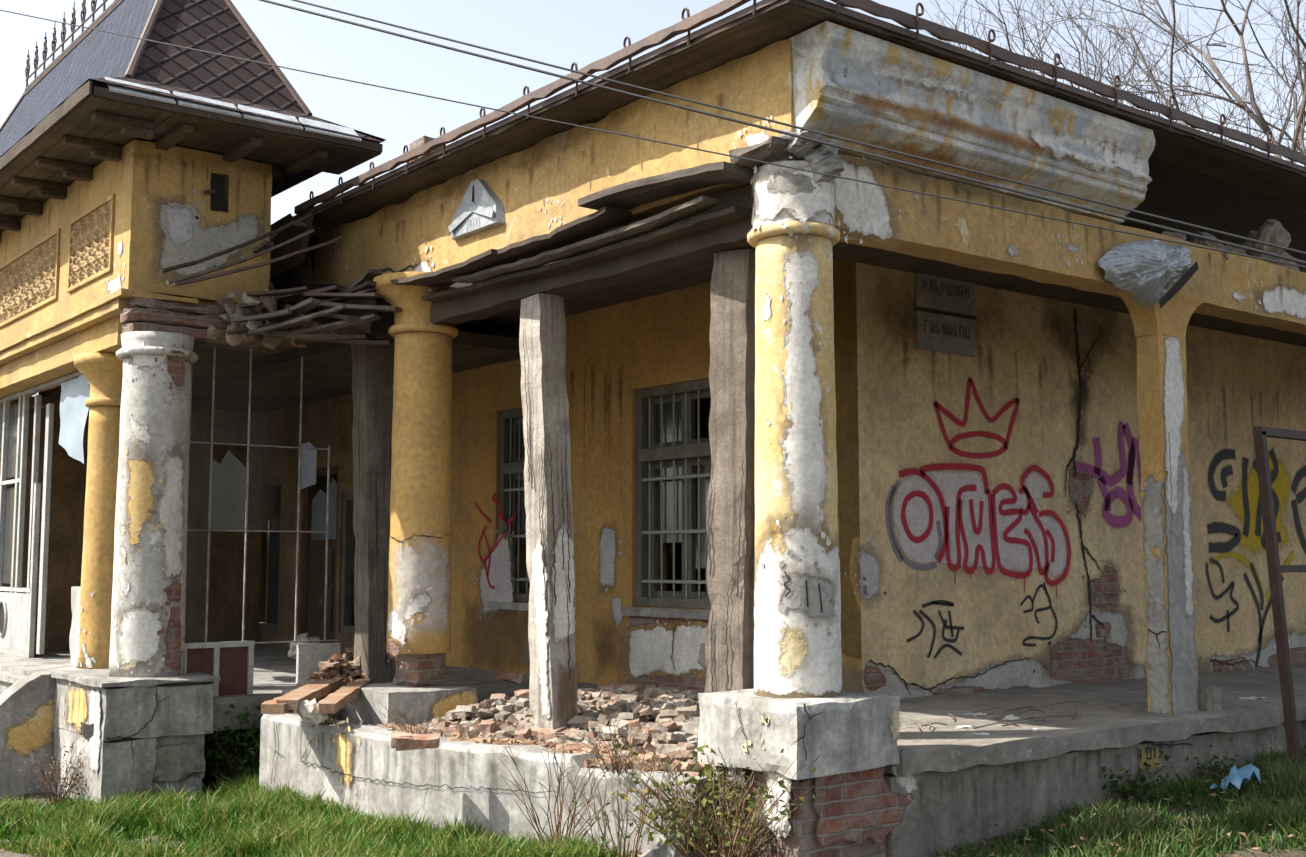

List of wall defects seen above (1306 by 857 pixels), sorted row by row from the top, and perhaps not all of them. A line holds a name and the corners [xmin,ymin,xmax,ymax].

rust [870,143,994,182]
rust [858,96,1047,153]
spalling [155,173,269,278]
peeling [724,116,1306,785]
crack [1065,308,1106,664]
peeling [113,412,187,676]
crack [390,534,447,564]
peeling [386,576,432,670]
peeling [594,511,712,693]
crack [106,685,172,772]
crack [271,722,556,808]
spalling [757,772,792,839]